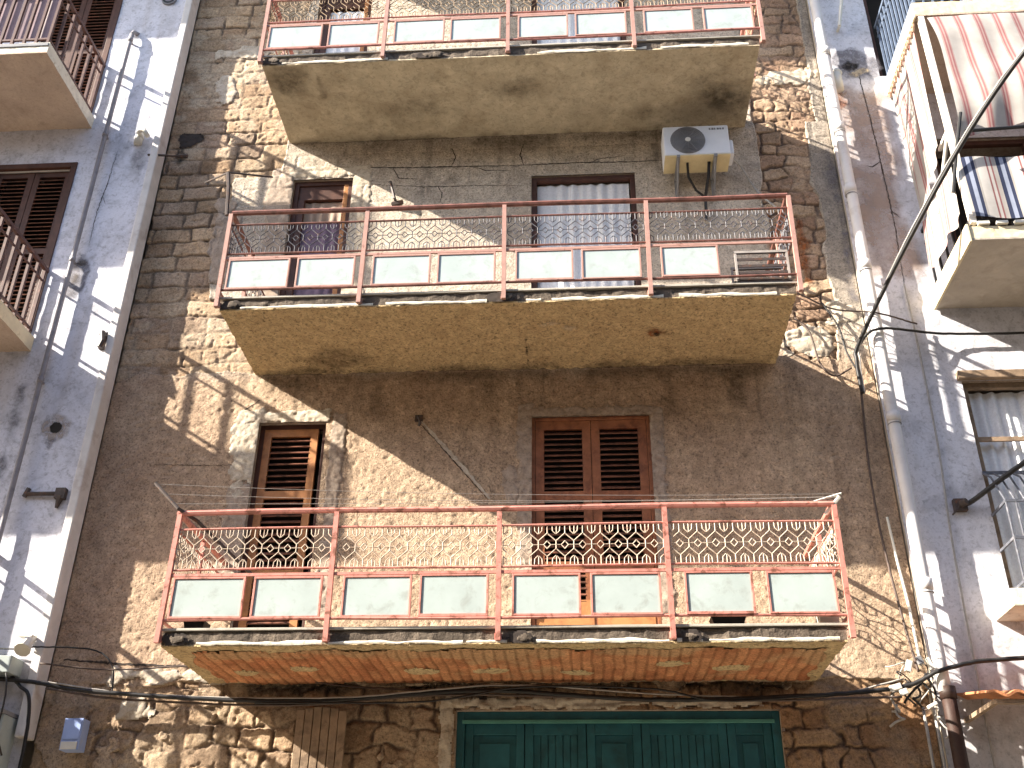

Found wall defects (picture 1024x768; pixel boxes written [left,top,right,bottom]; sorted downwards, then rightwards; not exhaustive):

crack [371,144,657,201]
crack [858,73,904,278]